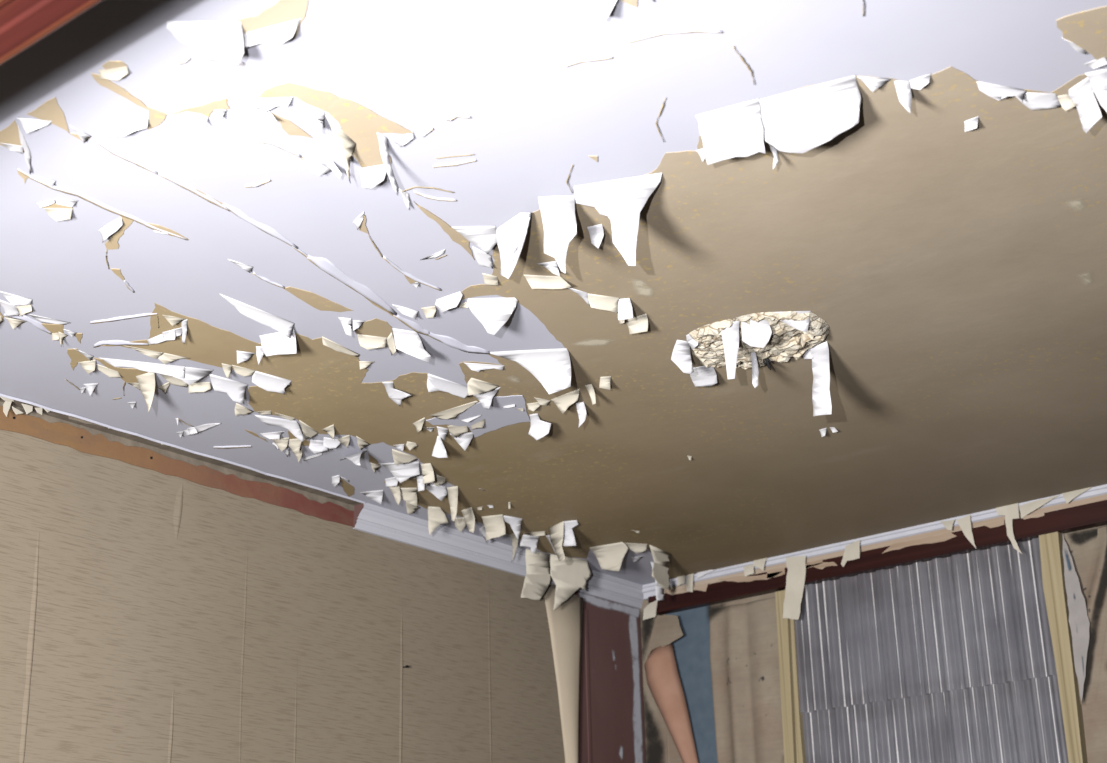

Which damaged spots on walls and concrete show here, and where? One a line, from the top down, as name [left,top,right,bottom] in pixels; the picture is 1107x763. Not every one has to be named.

peeling [1056,6,1107,69]
peeling [0,61,230,174]
peeling [36,198,78,221]
peeling [0,291,82,347]
peeling [65,66,1107,620]
peeling [0,396,50,417]
peeling [520,520,591,763]
peeling [1062,533,1090,701]